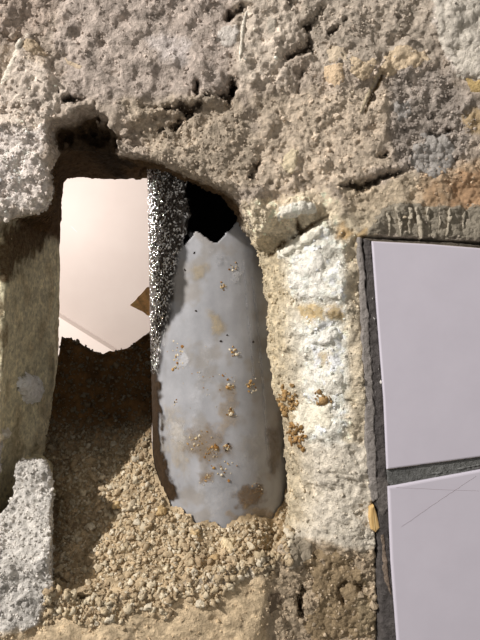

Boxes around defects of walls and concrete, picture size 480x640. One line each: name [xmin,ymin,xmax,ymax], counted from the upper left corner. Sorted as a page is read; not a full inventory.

crack [345,172,401,191]